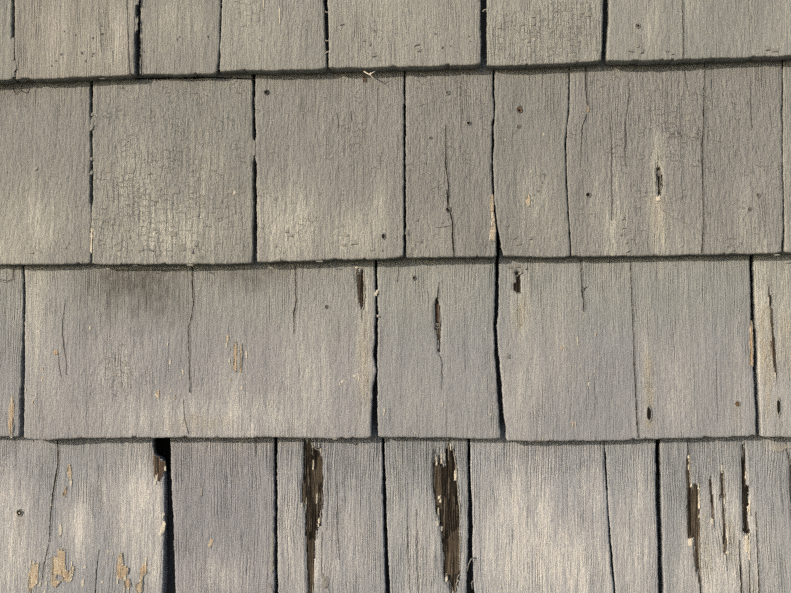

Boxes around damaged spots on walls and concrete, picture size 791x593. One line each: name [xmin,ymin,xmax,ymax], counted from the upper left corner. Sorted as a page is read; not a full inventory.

crack [99,148,245,434]
peeling [27,548,86,593]
peeling [112,552,147,593]
peeling [686,453,729,584]